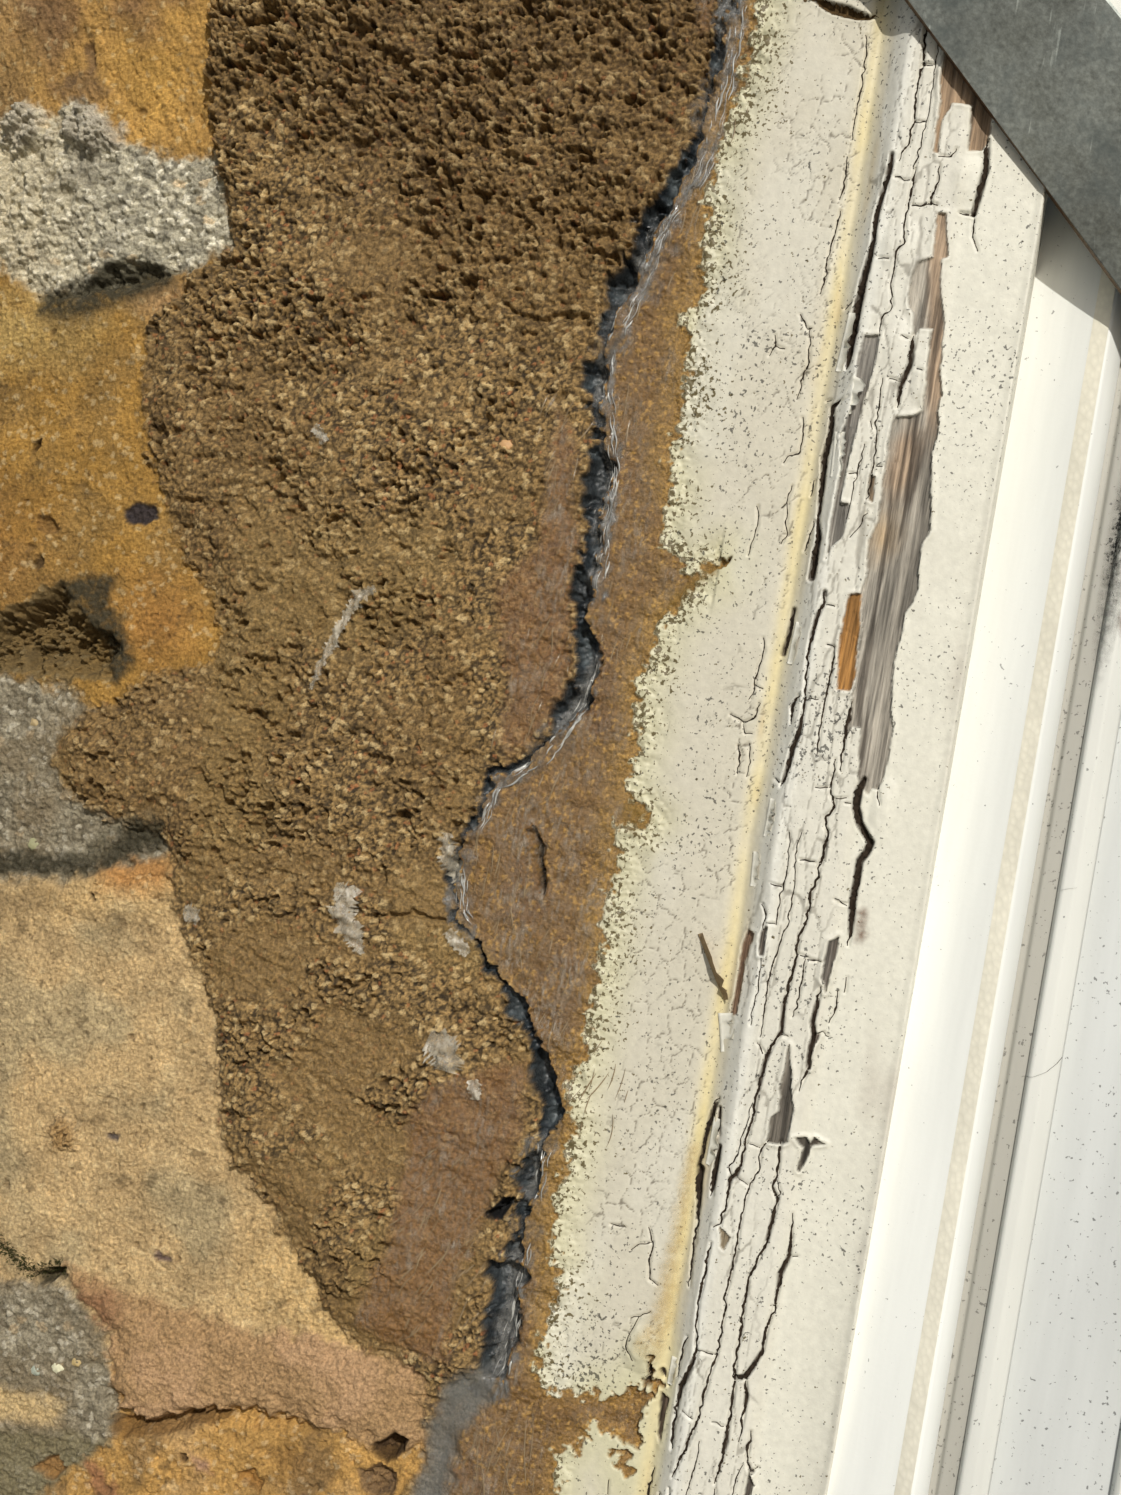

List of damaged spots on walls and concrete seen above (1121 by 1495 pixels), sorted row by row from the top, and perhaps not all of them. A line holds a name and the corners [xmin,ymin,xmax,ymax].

peeling [934,58,993,153]
peeling [826,313,880,559]
peeling [838,212,949,793]
crack [444,0,740,1379]
crack [611,0,989,1495]
peeling [698,926,768,1052]
peeling [822,937,840,991]
peeling [706,1117,720,1166]
peeling [768,1033,825,1172]
peeling [719,1227,731,1250]
peeling [659,1356,678,1440]
peeling [745,1472,755,1495]